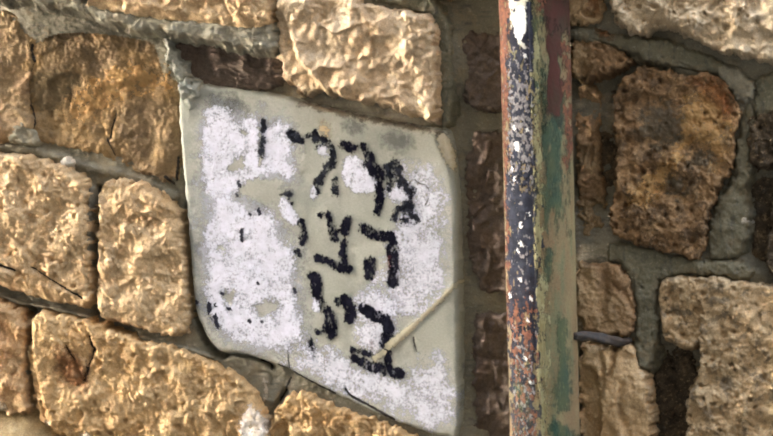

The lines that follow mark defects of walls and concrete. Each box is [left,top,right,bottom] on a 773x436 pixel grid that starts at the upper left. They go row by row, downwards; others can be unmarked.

corrosion [499,0,539,436]
peeling [502,0,580,436]
corrosion [555,33,573,175]